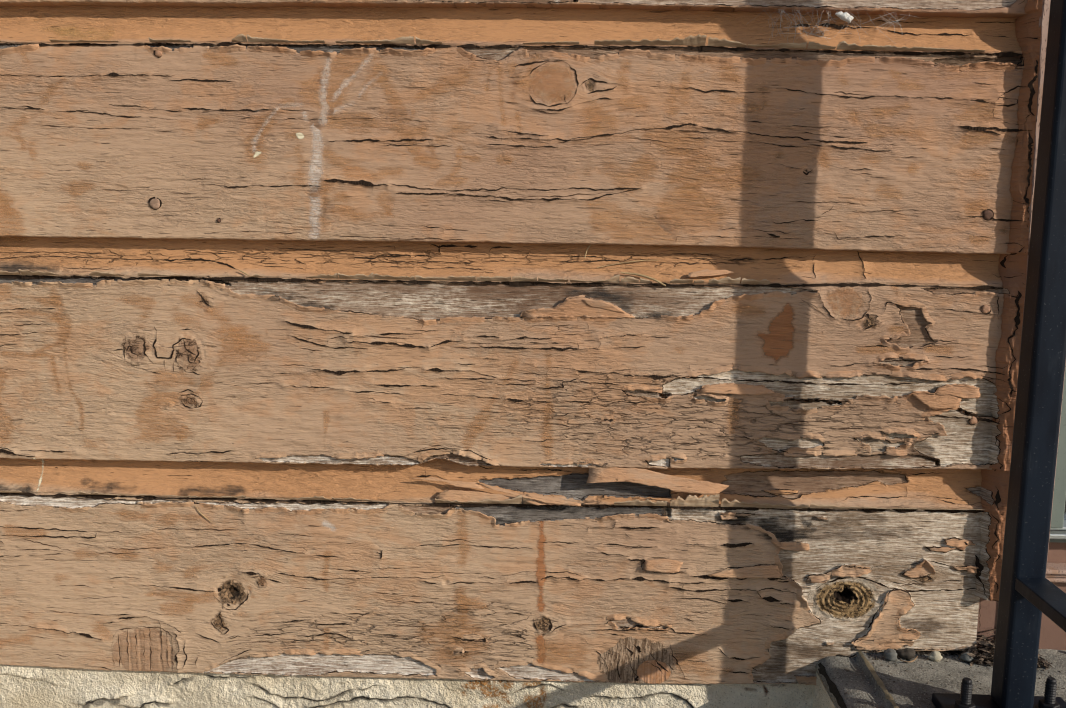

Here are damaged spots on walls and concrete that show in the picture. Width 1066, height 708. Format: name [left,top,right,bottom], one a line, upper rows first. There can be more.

peeling [385,0,1017,10]
crack [0,225,646,273]
peeling [0,269,820,326]
crack [224,0,1038,642]
peeling [922,287,1010,298]
peeling [0,300,1001,686]
crack [0,510,812,708]